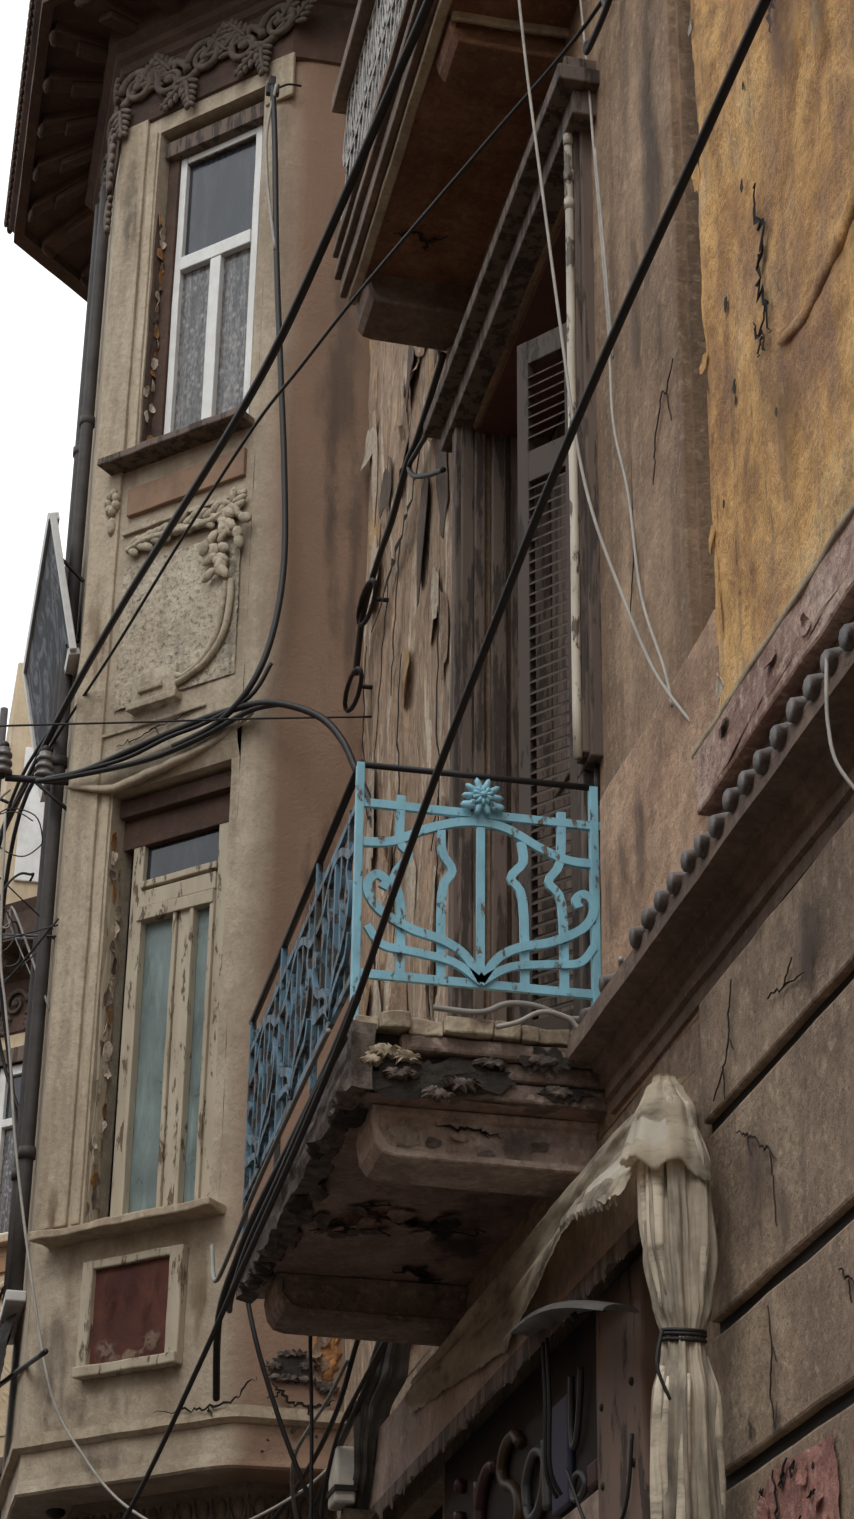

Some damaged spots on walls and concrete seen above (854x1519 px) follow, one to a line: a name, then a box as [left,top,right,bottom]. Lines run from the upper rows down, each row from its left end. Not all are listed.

peeling [141,213,167,443]
crack [752,183,772,358]
flaking render [236,339,595,1304]
peeling [85,832,123,1223]
crack [713,979,777,1226]
crack [767,957,805,999]
crack [154,1377,336,1417]